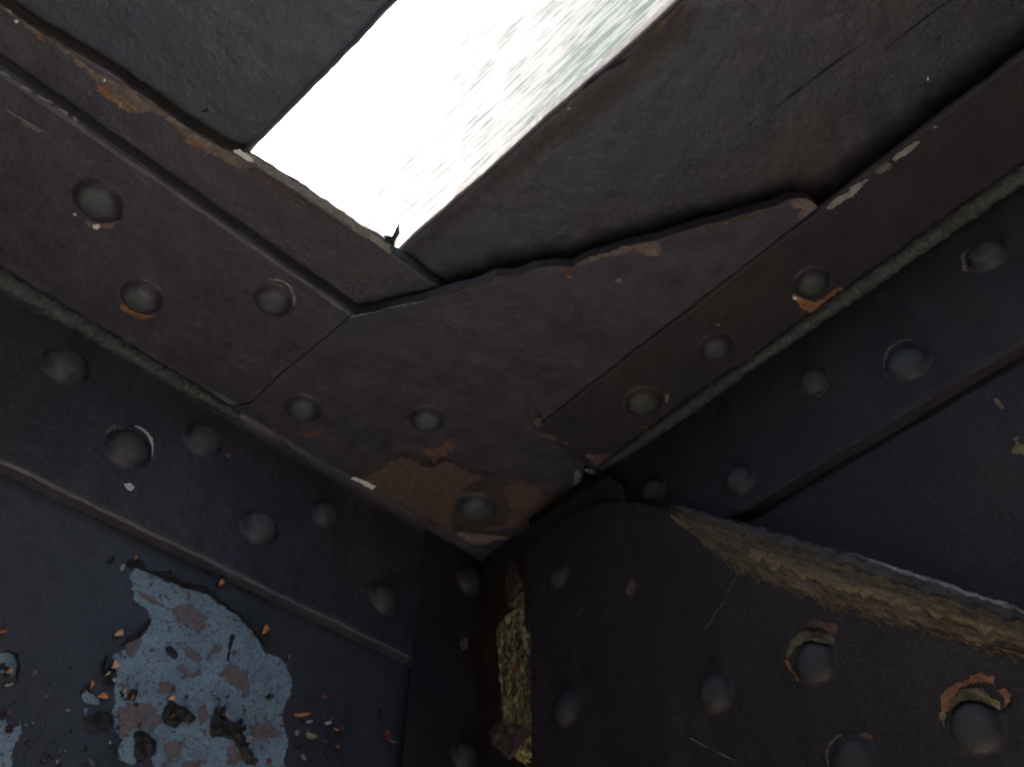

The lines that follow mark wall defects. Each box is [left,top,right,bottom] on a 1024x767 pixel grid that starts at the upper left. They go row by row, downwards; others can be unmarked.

rust [2,6,343,229]
spalling [707,141,920,230]
spalling [557,241,662,279]
rust [792,287,840,313]
rust [667,504,1024,681]
peeling [0,650,52,698]
peeling [80,554,349,767]
rust [488,569,532,767]
peeling [0,700,47,767]